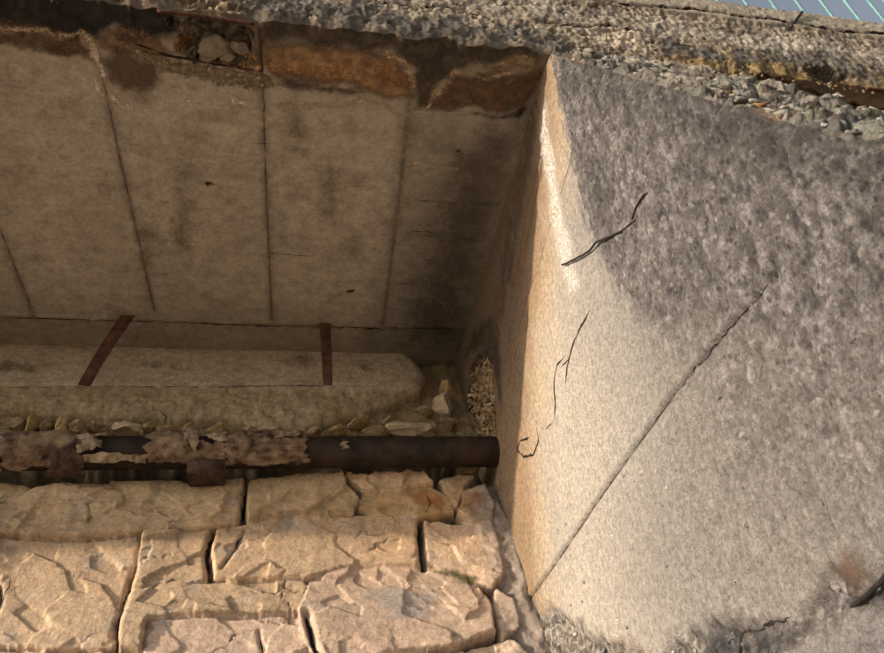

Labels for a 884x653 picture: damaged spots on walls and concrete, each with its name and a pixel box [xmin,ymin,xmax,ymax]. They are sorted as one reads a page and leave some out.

spalling [143,0,284,90]
crack [517,310,590,458]
crack [533,277,777,596]
crack [205,492,247,584]
crack [116,577,135,639]
crack [305,618,318,653]
crack [713,617,790,653]